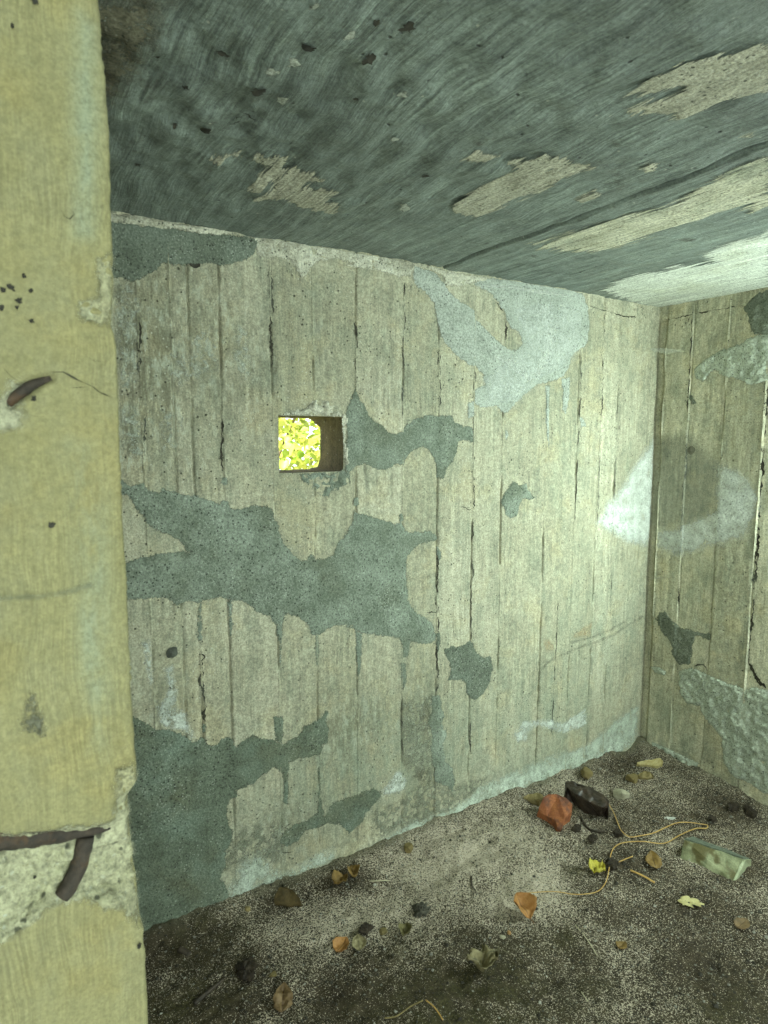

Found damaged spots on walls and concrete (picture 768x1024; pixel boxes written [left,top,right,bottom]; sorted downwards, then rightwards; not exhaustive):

peeling [623,43,768,121]
peeling [247,152,340,215]
peeling [452,150,596,218]
peeling [530,157,768,253]
peeling [600,230,768,307]
crack [748,386,768,688]
spalling [0,766,140,943]